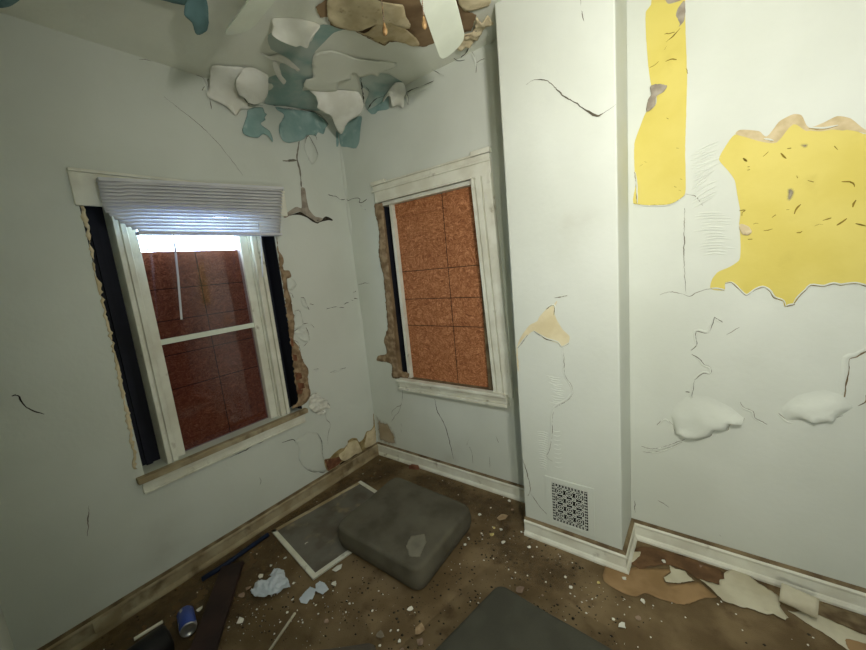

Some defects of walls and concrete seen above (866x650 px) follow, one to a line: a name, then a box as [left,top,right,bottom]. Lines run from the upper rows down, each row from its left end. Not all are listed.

peeling [163,0,209,35]
spalling [454,0,493,61]
spalling [207,0,434,148]
crack [526,79,615,117]
peeling [633,0,688,207]
crack [283,141,367,224]
peeling [710,114,866,307]
spalling [276,237,330,415]
spalling [374,203,409,379]
crack [685,317,738,399]
crack [839,348,866,406]
spalling [324,414,376,471]